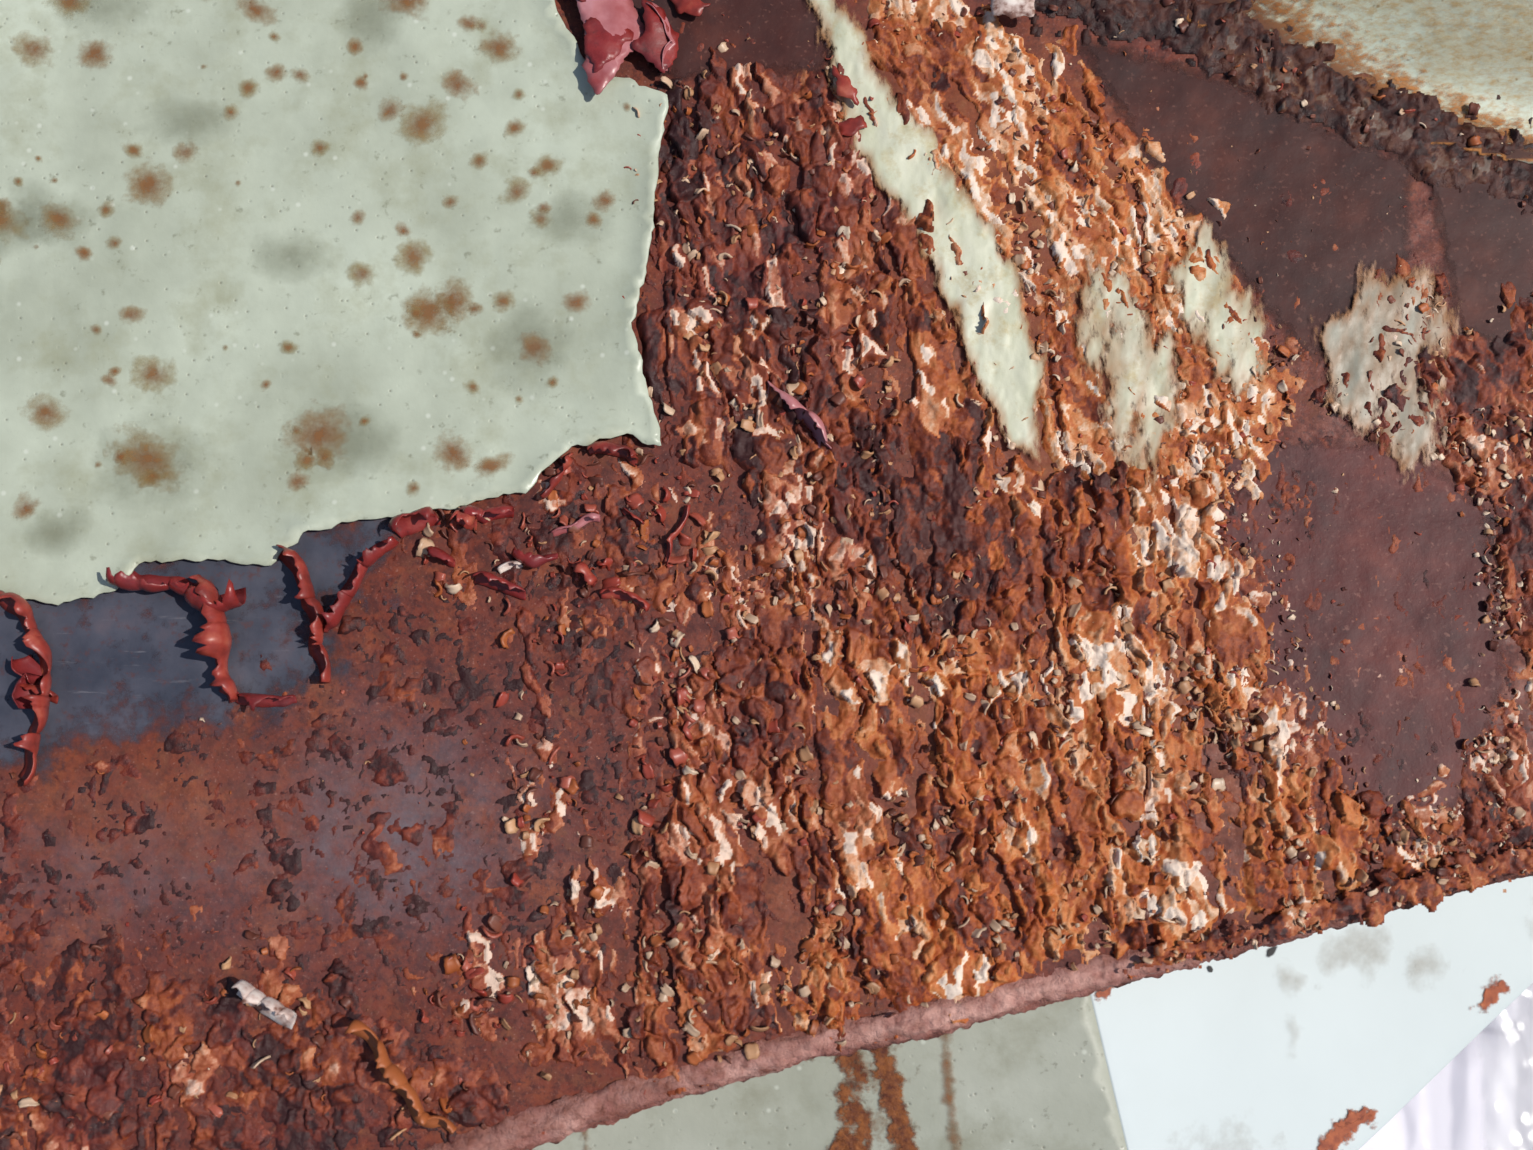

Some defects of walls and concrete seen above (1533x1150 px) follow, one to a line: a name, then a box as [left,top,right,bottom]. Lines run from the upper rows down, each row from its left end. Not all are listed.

peeling [990,0,1070,19]
rust [1186,0,1533,162]
peeling [810,0,1047,461]
rust [946,218,982,298]
peeling [0,0,711,787]
peeling [767,380,832,449]
peeling [1064,220,1268,526]
peeling [1314,263,1459,481]
rust [62,749,166,900]
rust [224,708,372,912]
rust [306,725,464,995]
rust [870,1039,918,1150]